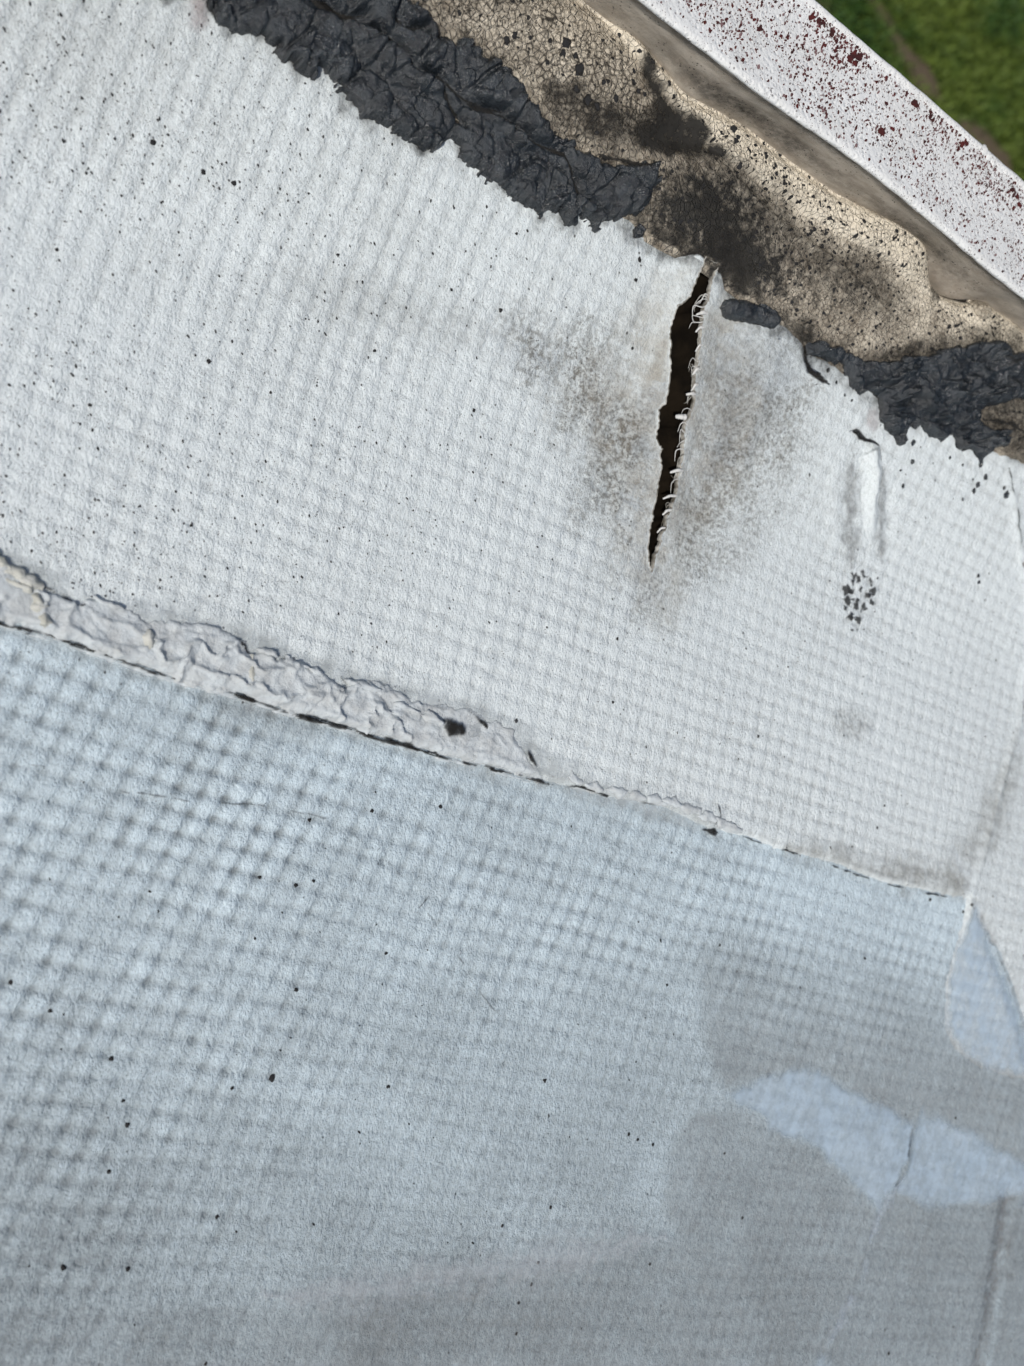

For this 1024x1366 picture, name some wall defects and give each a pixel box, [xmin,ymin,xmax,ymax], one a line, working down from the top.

crack [310,0,664,194]
crack [987,420,1024,432]
damp [736,1073,1024,1201]